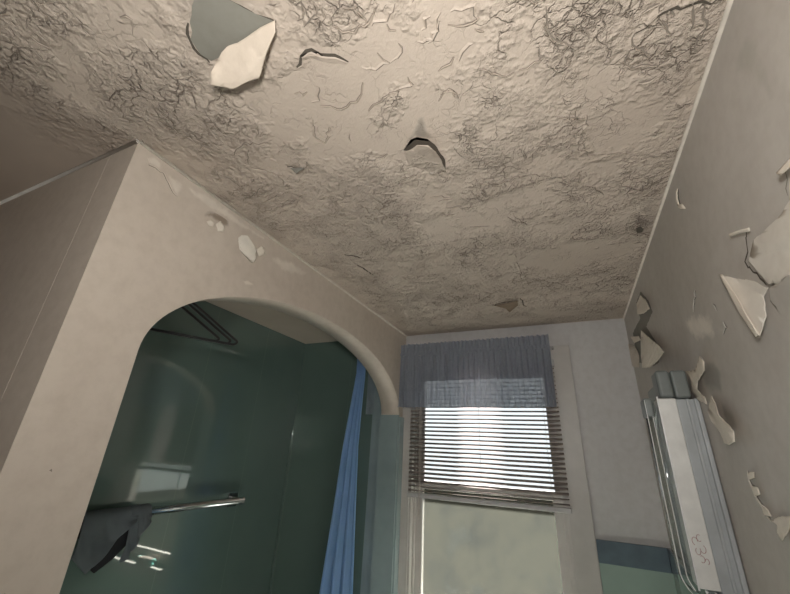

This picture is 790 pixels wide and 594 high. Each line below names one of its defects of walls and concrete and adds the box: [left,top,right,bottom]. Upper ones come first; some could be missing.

peeling [186,0,276,89]
crack [294,0,484,144]
crack [478,0,590,78]
crack [606,0,726,86]
peeling [404,115,446,173]
crack [477,115,668,195]
peeling [719,158,790,337]
peeling [628,292,664,368]
peeling [686,356,740,445]
spalling [747,471,790,541]